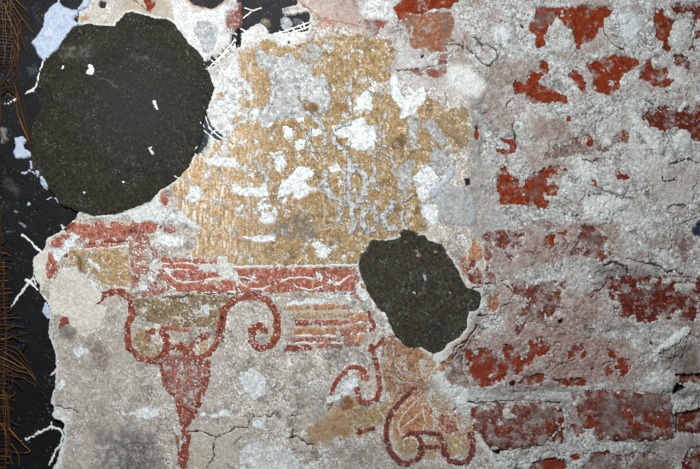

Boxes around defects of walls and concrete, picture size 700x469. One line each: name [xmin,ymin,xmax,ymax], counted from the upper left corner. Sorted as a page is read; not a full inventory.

flaking render [190,0,335,243]
flaking render [390,0,459,227]
crack [448,37,499,67]
flaking render [513,61,568,104]
flaking render [521,4,614,49]
flaking render [568,1,700,96]
flaking render [642,104,700,142]
flaking render [467,130,632,337]
crack [603,258,683,275]
flaking render [587,230,700,325]
crack [190,412,315,468]
flaking render [446,337,700,469]